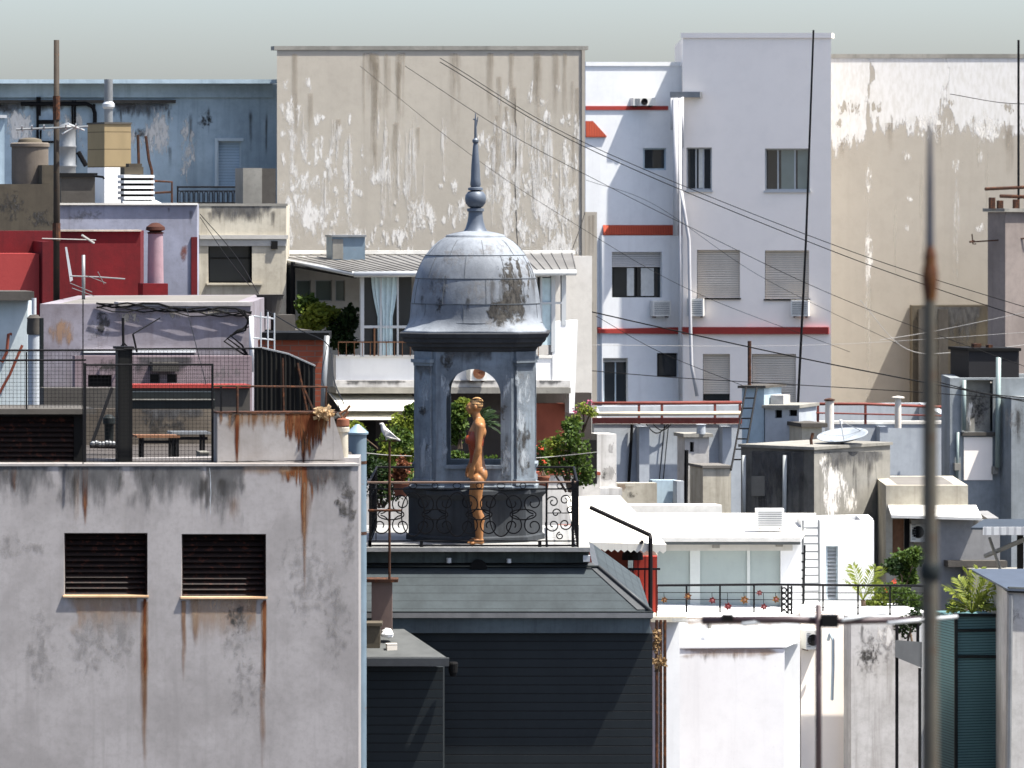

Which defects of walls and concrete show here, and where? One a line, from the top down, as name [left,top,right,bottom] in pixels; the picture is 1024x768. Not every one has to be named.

peeling [831,58,1024,162]
peeling [280,81,467,250]
peeling [477,80,581,256]
leakage [486,257,534,326]
leakage [0,466,47,496]
leakage [60,466,244,502]
corrosion [219,414,331,567]
leakage [307,466,356,520]
leakage [822,452,879,473]
corrosion [71,597,147,717]
corrosion [182,599,266,681]